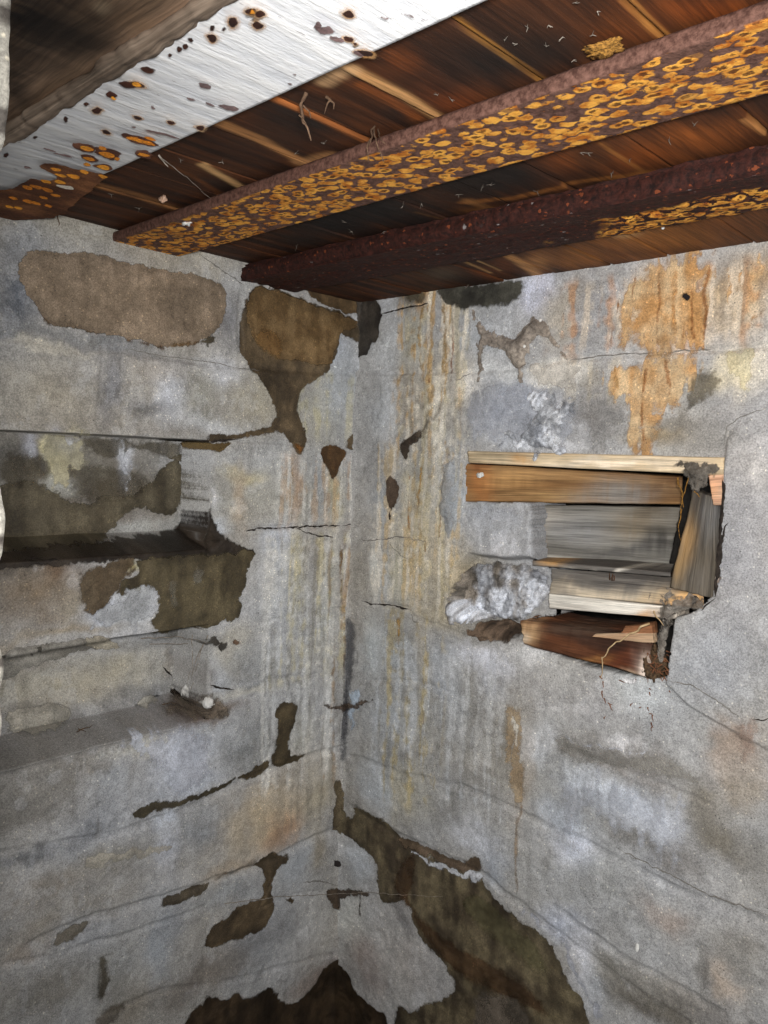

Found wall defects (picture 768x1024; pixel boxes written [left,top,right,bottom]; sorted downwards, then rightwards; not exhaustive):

rust [342,36,375,58]